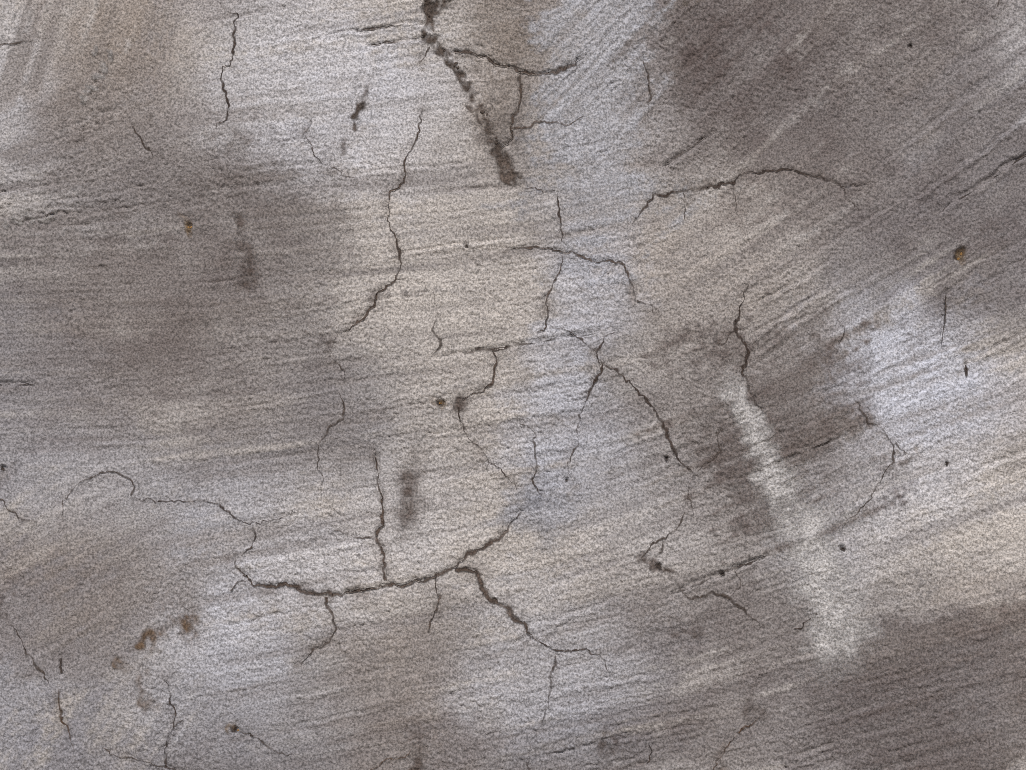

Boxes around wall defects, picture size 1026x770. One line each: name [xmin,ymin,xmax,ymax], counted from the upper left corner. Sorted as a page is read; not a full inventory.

crack [216,3,239,126]
crack [62,349,607,719]
crack [317,112,442,485]
crack [511,187,723,556]
crack [643,62,652,111]
crack [634,168,866,220]